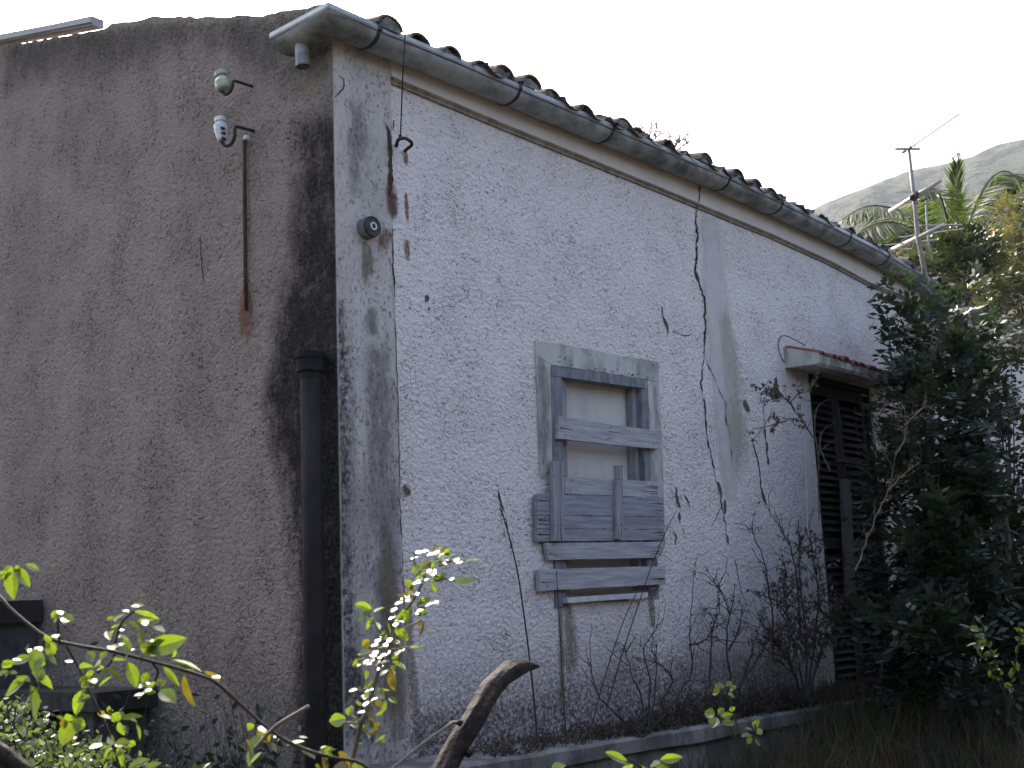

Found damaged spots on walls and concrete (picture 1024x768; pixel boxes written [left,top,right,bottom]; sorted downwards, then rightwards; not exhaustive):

rust [386,120,409,219]
leakage [267,116,374,768]
crack [662,185,770,544]